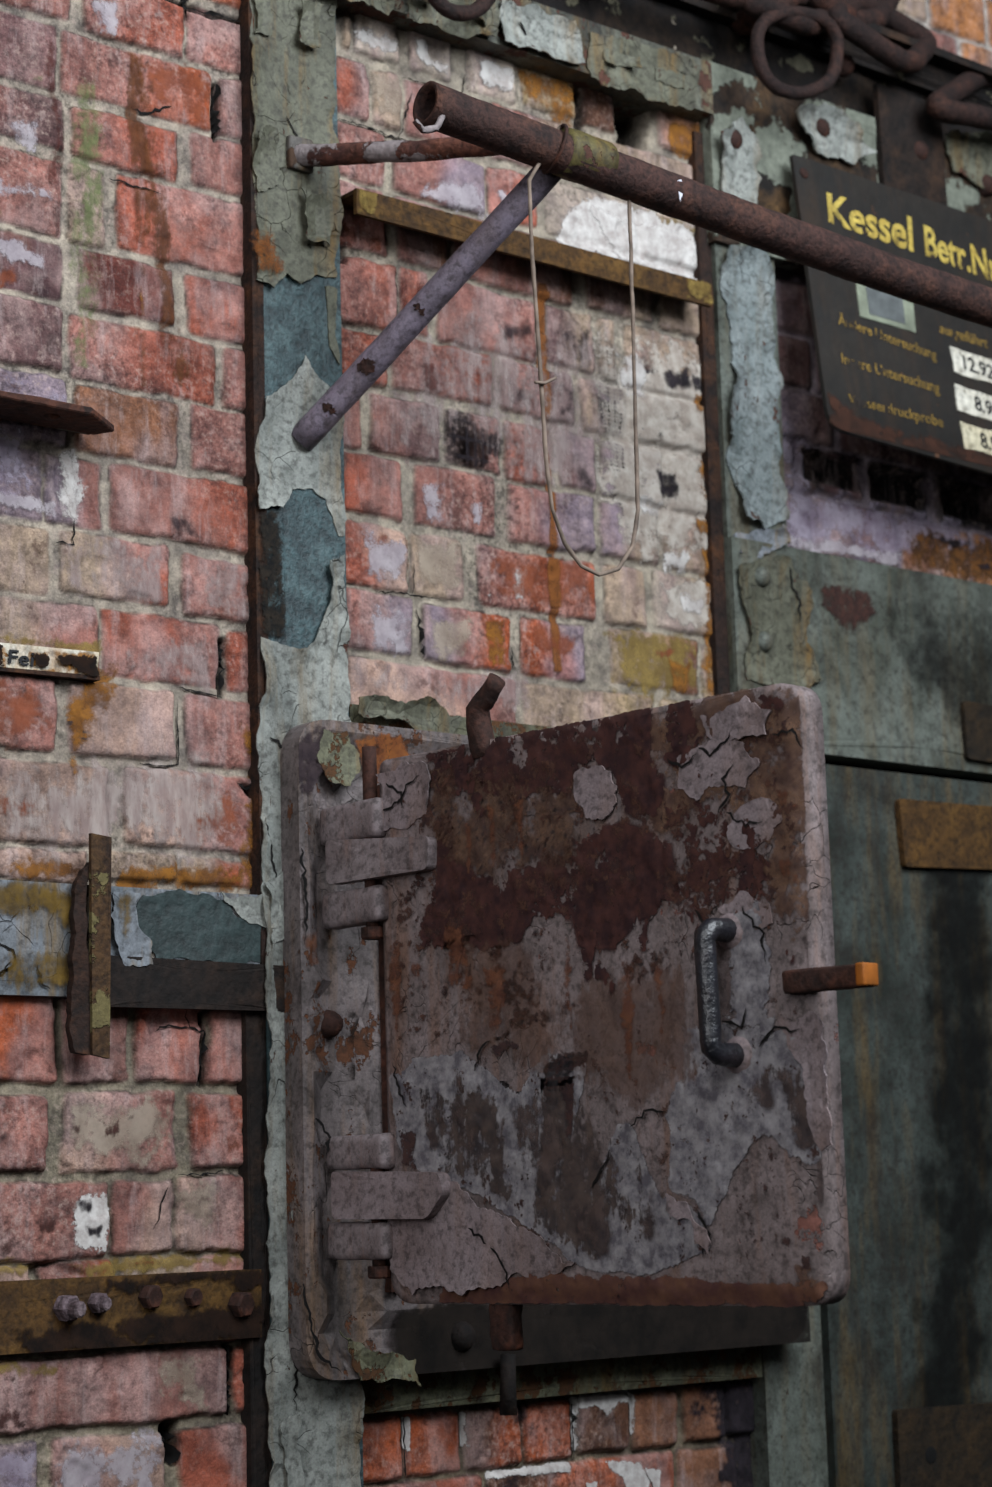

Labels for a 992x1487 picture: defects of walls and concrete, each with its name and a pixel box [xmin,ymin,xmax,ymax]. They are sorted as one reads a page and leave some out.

peeling [236,0,700,376]
peeling [254,355,347,537]
corrosion [355,210,809,1039]
peeling [677,245,823,850]
corrosion [821,584,875,629]
corrosion [0,926,285,1487]
peeling [111,555,464,1487]
crack [468,1228,509,1285]
peeling [387,891,833,1296]
crack [592,1108,665,1187]
crack [742,907,766,962]
crack [721,1009,802,1047]